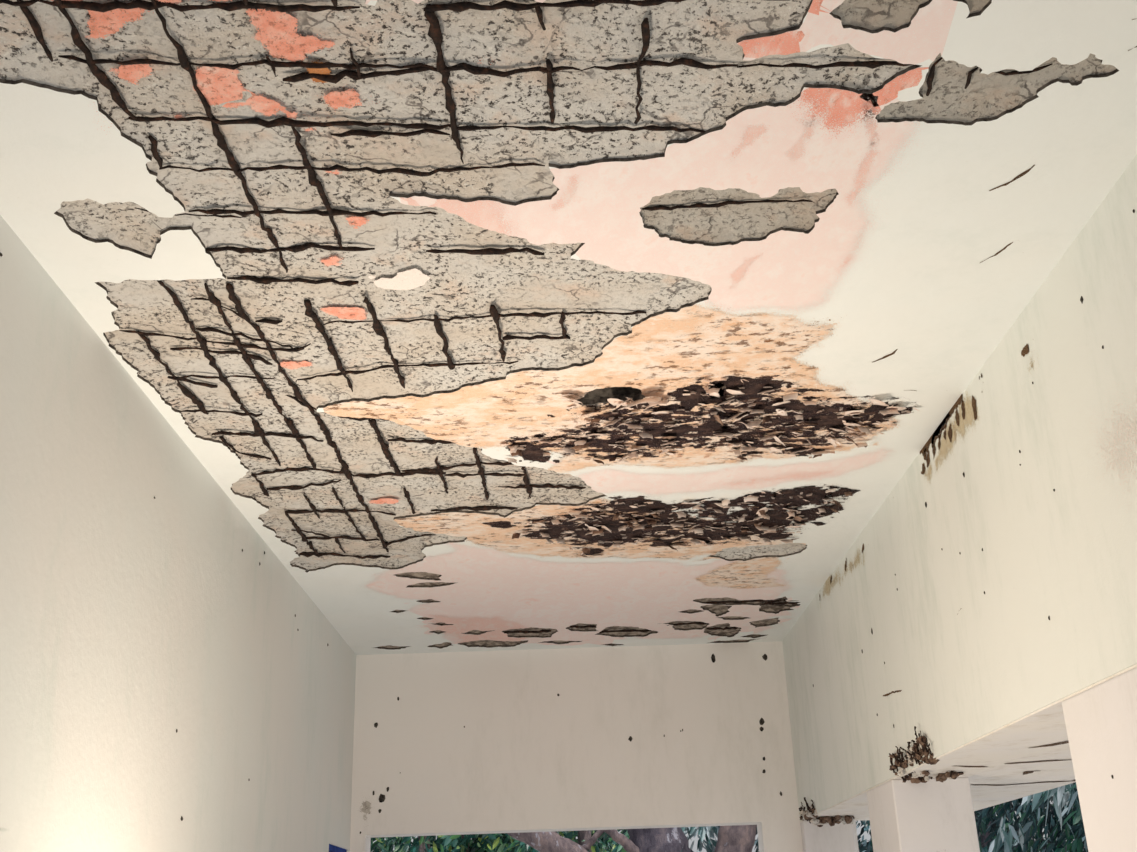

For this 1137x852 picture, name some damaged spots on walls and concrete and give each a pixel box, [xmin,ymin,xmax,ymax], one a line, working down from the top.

spalling [0,0,1119,663]
damp [323,302,919,473]
damp [394,483,860,590]
spalling [888,726,964,784]
spalling [799,797,855,827]